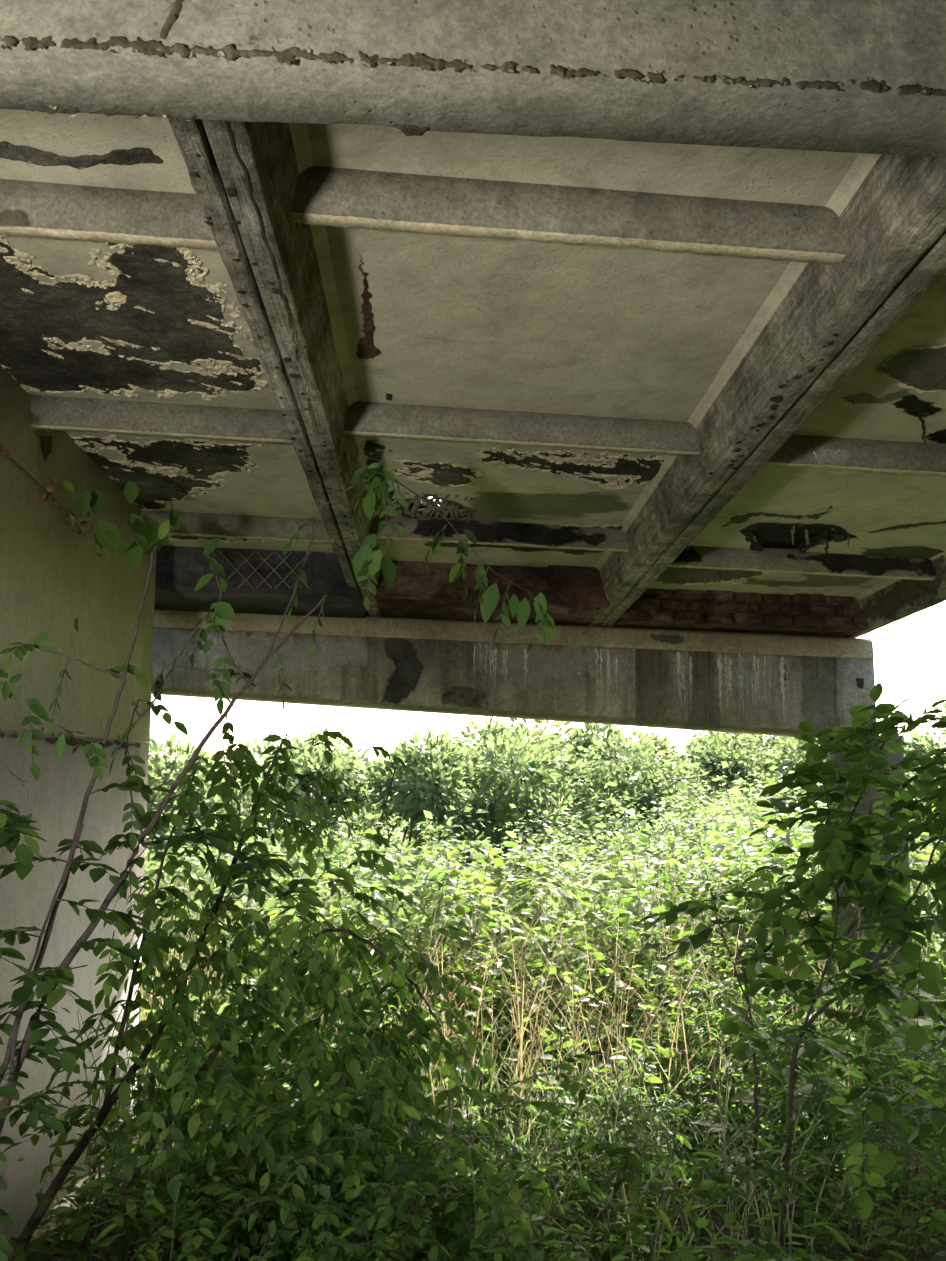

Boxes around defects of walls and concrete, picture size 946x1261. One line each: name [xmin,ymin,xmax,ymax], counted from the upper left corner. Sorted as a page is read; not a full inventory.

spalling [0,103,196,121]
spalling [0,141,163,170]
crack [224,121,335,476]
rust [356,251,381,359]
peeling [0,235,357,556]
peeling [876,344,946,393]
peeling [363,441,670,522]
spalling [740,523,860,554]
damp [473,645,509,697]
damp [595,649,618,709]
damp [650,634,692,713]
damp [717,653,787,716]